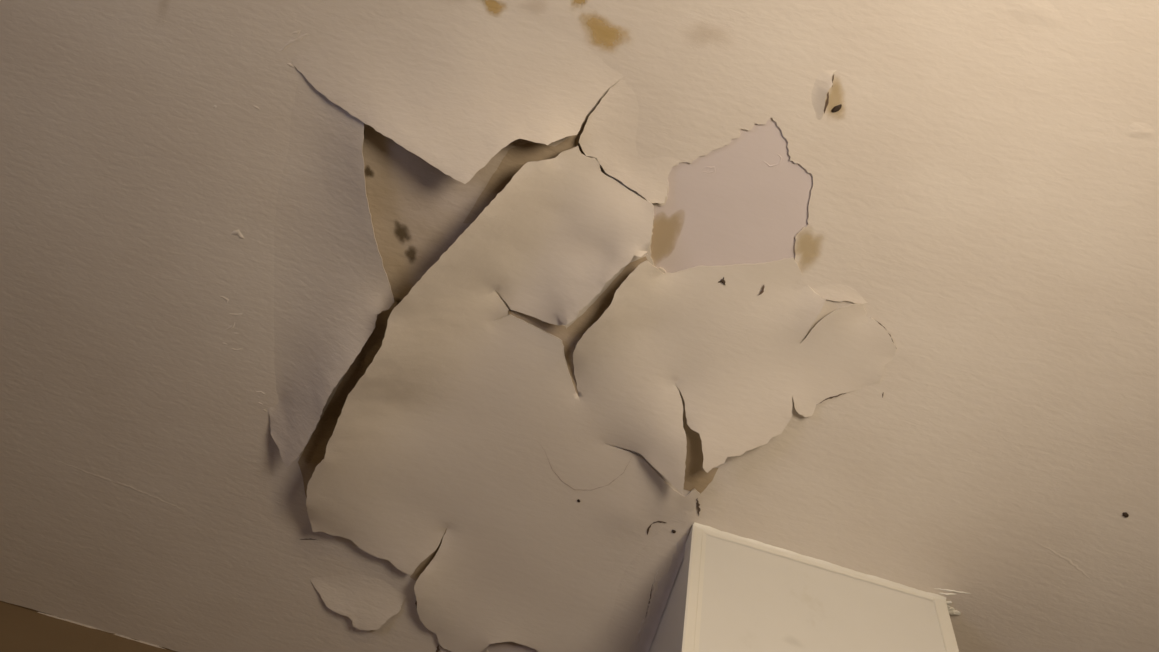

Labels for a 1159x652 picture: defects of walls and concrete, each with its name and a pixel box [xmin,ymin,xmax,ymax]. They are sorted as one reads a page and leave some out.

peeling [268,4,896,652]